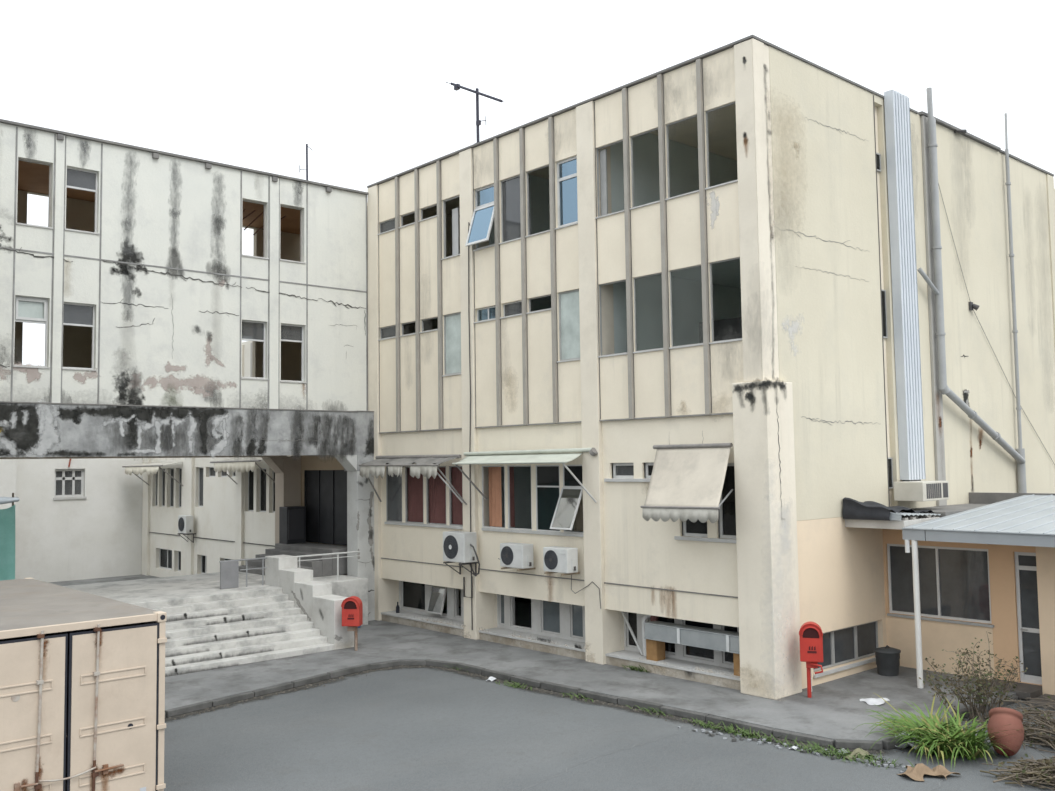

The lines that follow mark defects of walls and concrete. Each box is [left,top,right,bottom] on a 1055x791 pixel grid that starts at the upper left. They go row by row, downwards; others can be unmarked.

crack [3,247,73,262]
water stain [111,185,147,318]
water stain [169,213,183,277]
water stain [211,250,226,280]
crack [772,228,868,251]
crack [102,261,366,358]
peeling [196,327,223,366]
peeling [130,362,236,397]
water stain [734,378,785,403]
water stain [0,372,268,457]
water stain [291,411,354,457]
water stain [366,425,374,455]